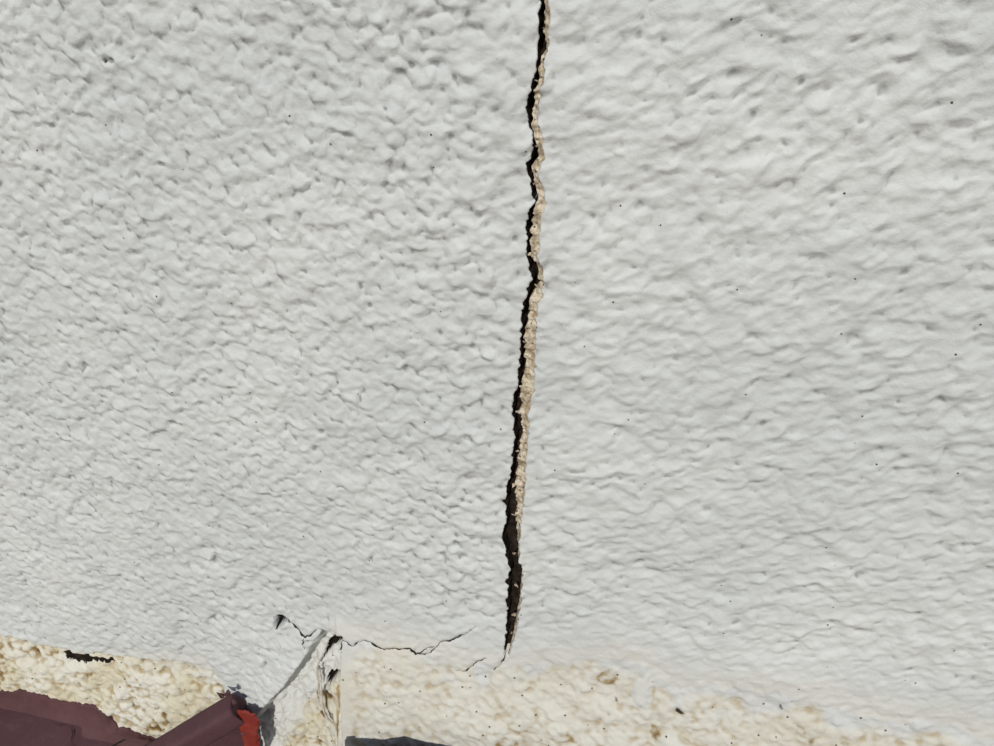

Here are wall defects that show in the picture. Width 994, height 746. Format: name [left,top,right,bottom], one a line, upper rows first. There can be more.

crack [463,0,550,672]
spalling [237,629,343,746]
crack [343,630,471,655]